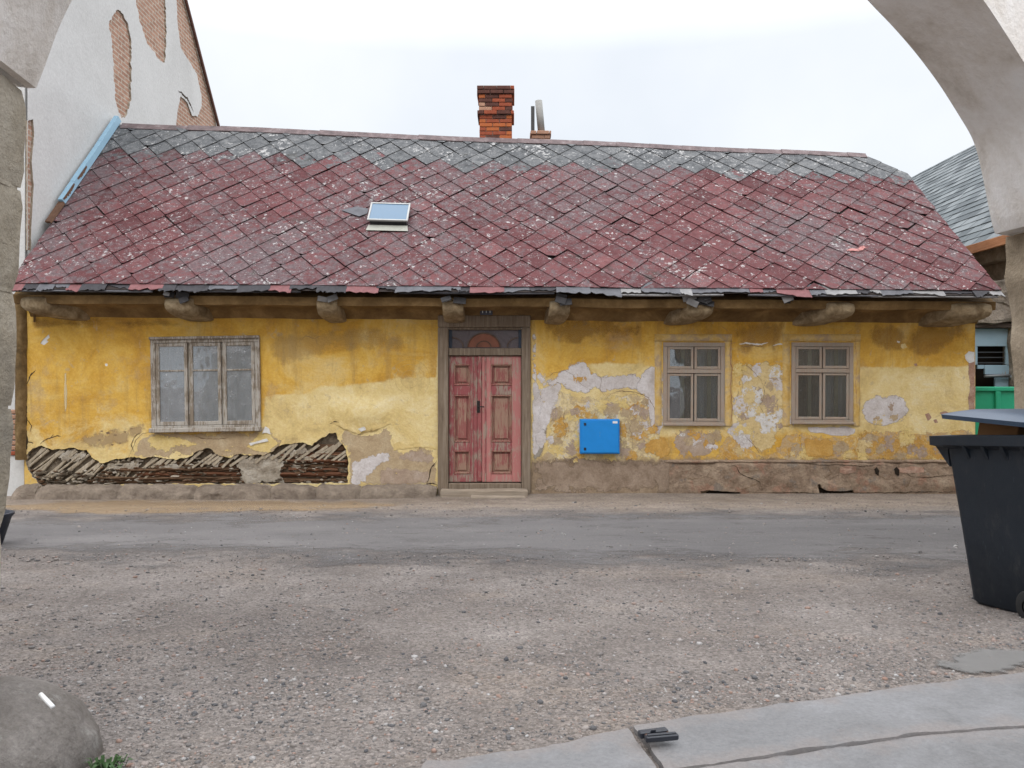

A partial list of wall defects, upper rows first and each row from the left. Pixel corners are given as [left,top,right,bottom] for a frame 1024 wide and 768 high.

flaking render [109,0,216,126]
flaking render [26,417,438,487]
peeling [532,334,973,474]
crack [684,463,955,494]